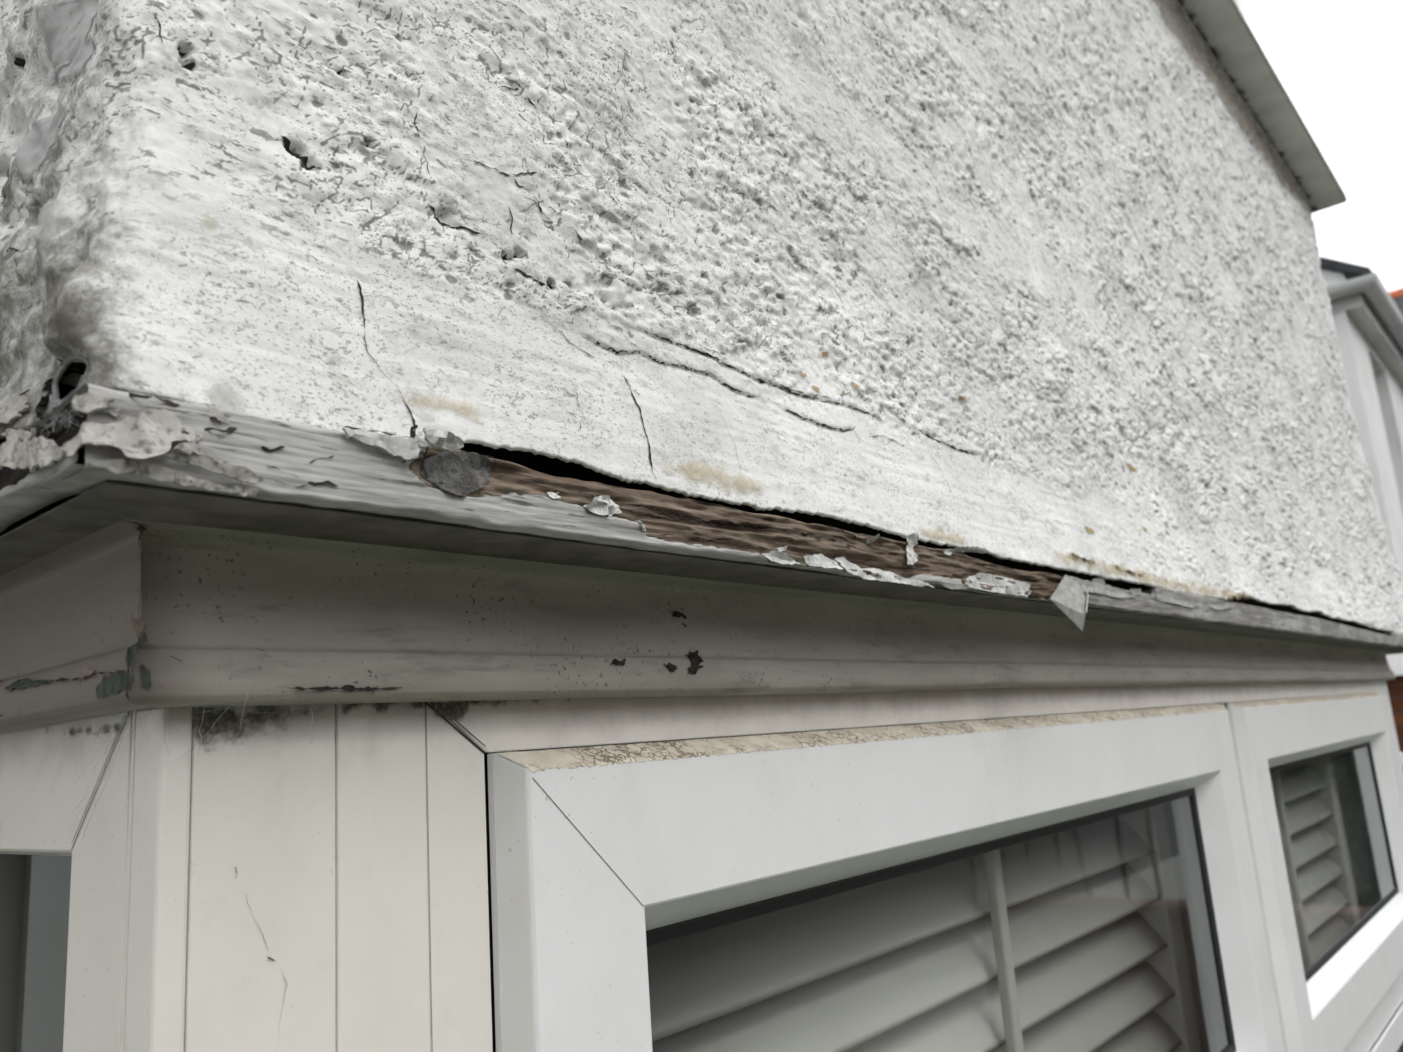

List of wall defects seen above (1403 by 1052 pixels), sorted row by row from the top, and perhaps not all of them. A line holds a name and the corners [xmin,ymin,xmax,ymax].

crack [414,110,584,249]
flaking render [0,392,265,497]
peeling [342,427,464,460]
crack [491,269,1020,573]
peeling [583,495,622,517]
peeling [762,532,1032,598]
peeling [1050,575,1238,631]
peeling [0,678,49,692]
peeling [78,617,152,699]